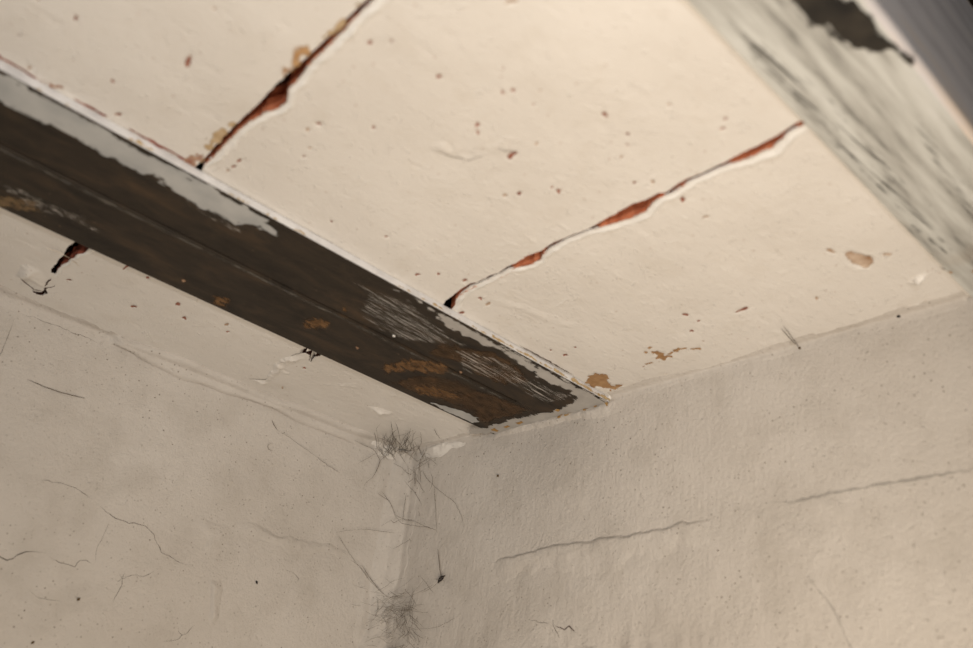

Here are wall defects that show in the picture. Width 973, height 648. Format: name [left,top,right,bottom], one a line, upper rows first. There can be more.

peeling [792,0,915,65]
peeling [184,153,204,167]
peeling [827,249,892,268]
peeling [431,403,479,423]
crack [0,511,189,567]